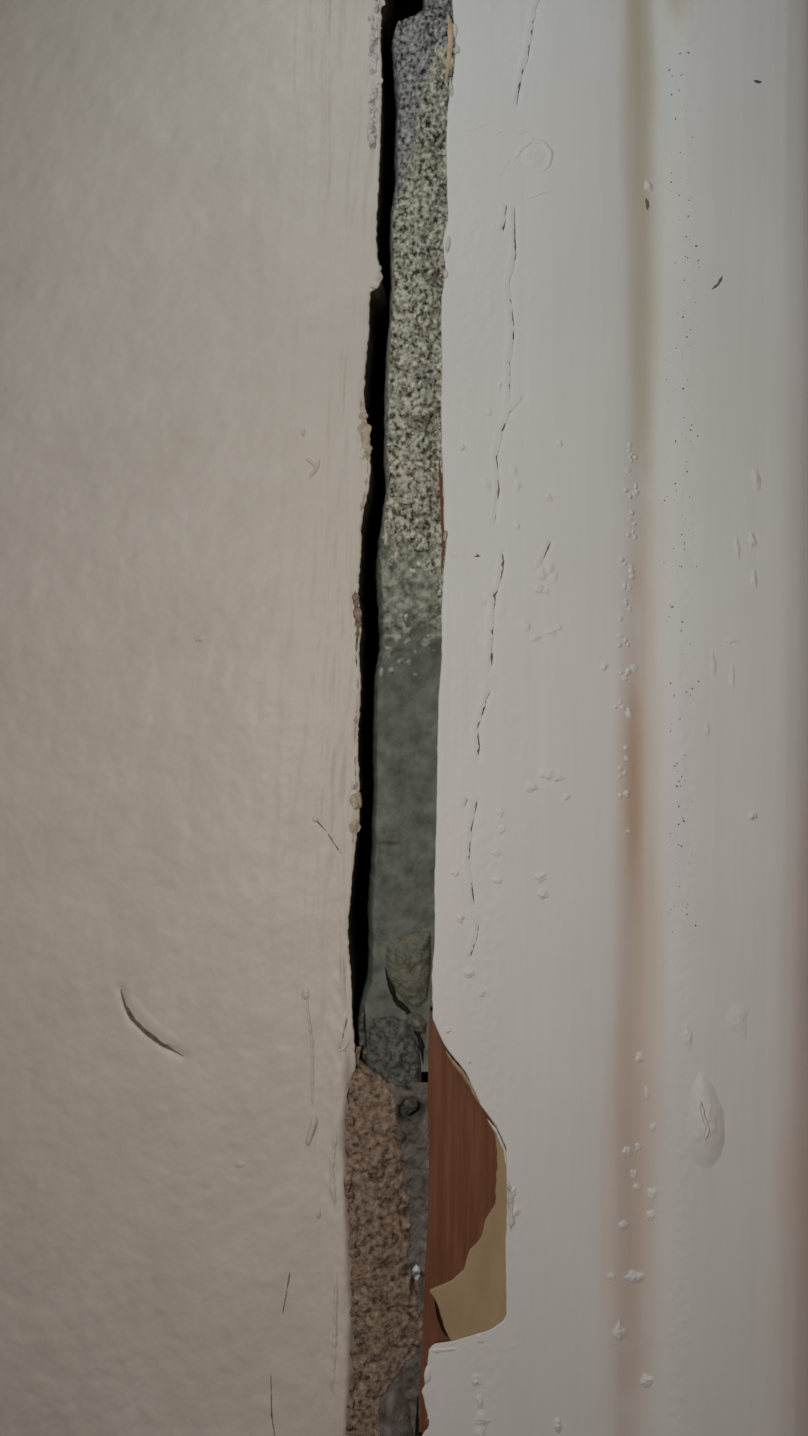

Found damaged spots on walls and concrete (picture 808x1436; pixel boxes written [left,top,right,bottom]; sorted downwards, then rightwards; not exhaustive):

crack [512,0,539,104]
crack [317,0,428,1083]
crack [451,204,551,956]
crack [414,1396,422,1436]
flaking render [344,1011,516,1436]